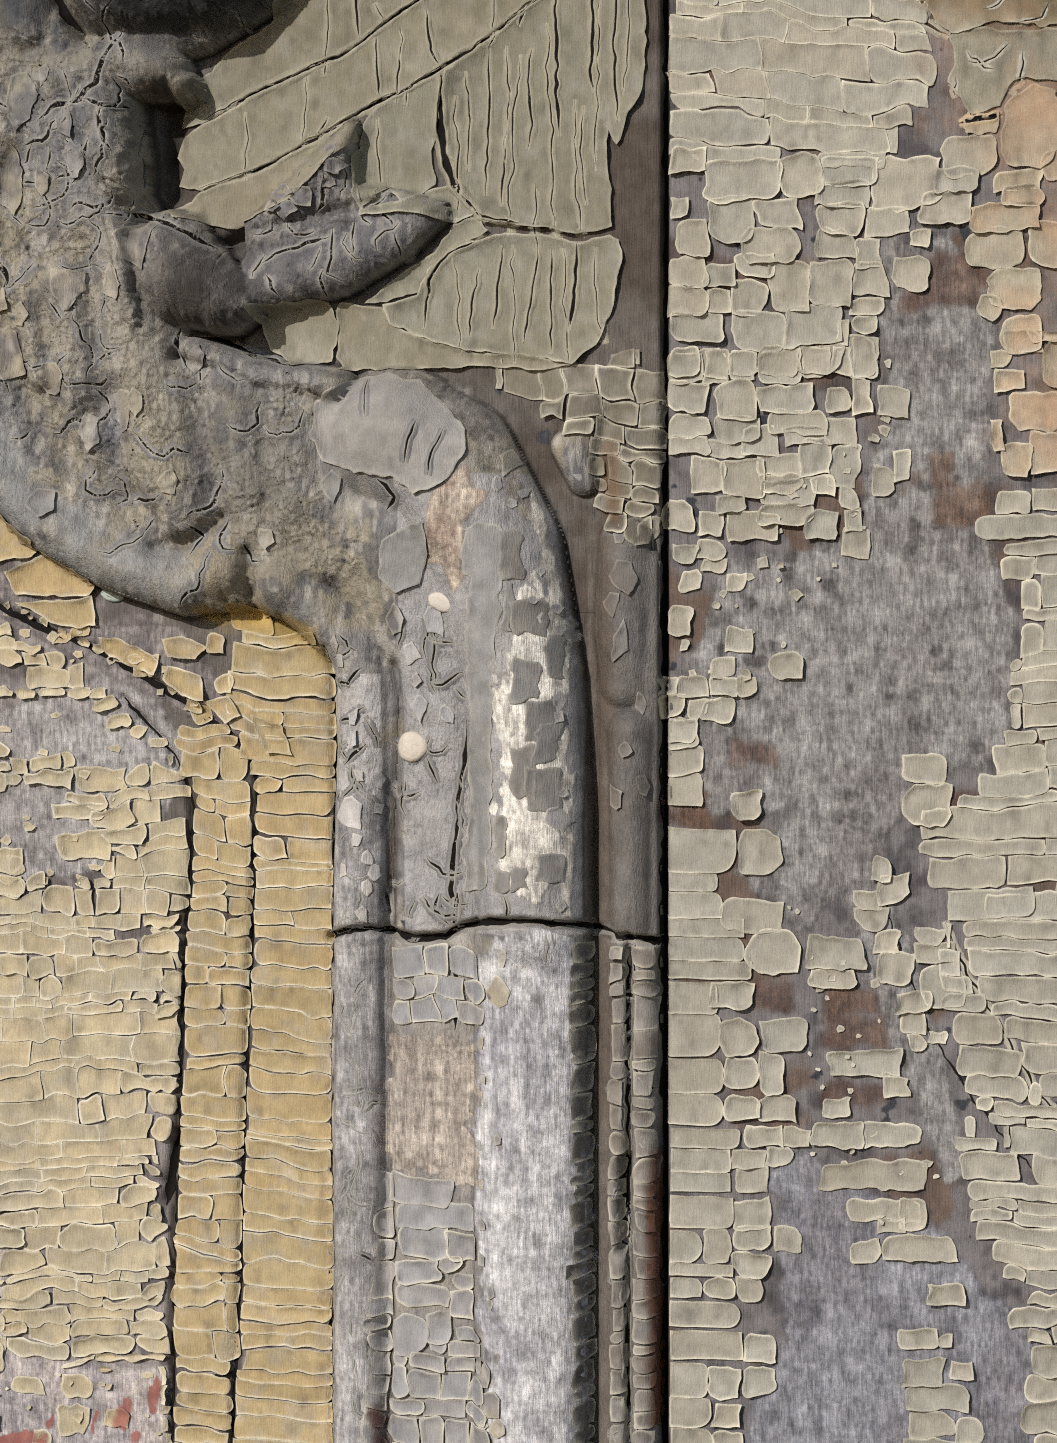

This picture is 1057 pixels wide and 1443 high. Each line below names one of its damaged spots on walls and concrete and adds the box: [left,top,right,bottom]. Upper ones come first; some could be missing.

peeling [0,63,49,215]
peeling [54,108,84,178]
peeling [0,287,62,395]
peeling [24,488,55,517]
peeling [78,411,99,453]
peeling [49,222,157,311]
peeling [113,387,142,433]
peeling [167,0,1057,1290]
crack [0,0,669,1443]
peeling [0,515,598,1443]
peeling [607,946,663,1443]
peeling [669,1121,1057,1443]